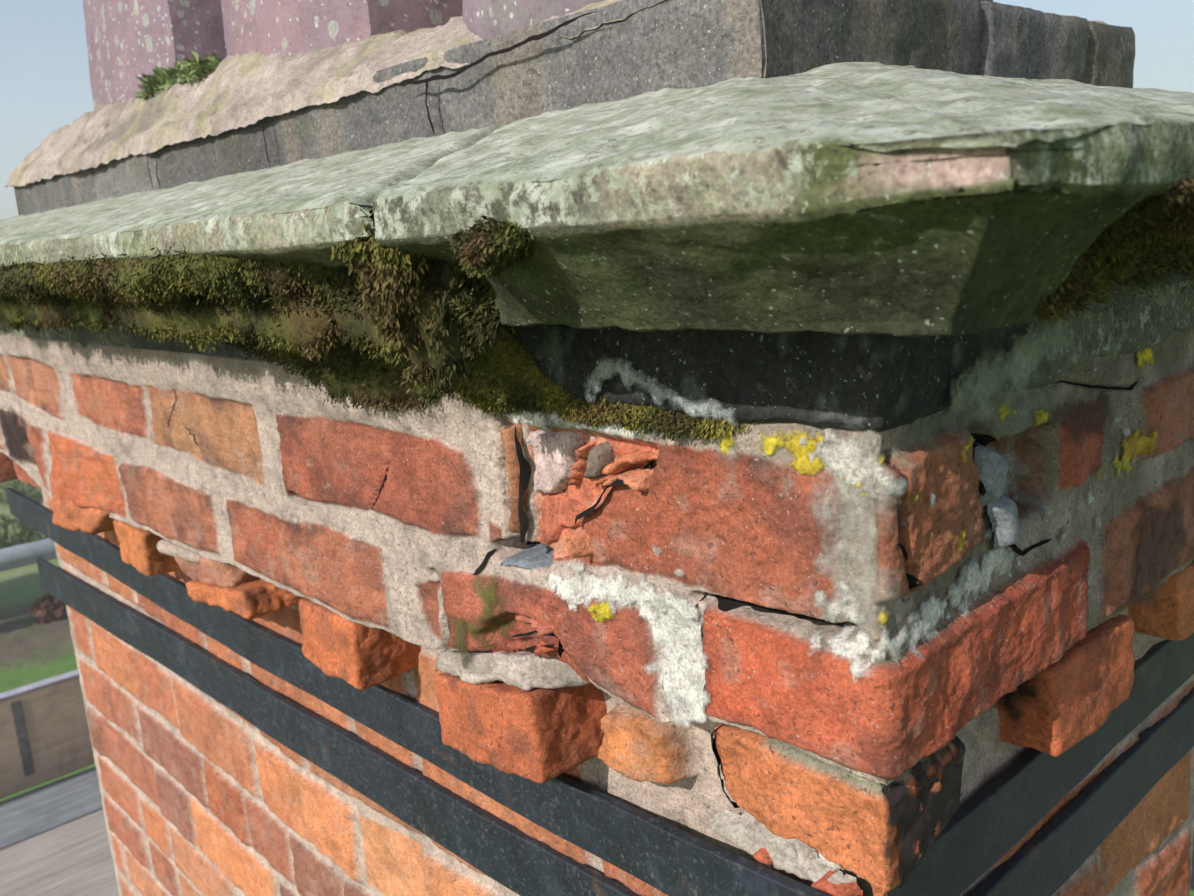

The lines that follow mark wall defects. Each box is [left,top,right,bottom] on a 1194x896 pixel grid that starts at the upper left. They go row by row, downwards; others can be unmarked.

crack [398,11,597,135]
crack [262,123,270,166]
crack [1027,377,1143,390]
crack [970,433,997,446]
spalling [499,423,659,560]
crack [897,504,921,589]
crack [1008,539,1051,556]
crack [695,592,858,638]
crack [711,724,740,808]